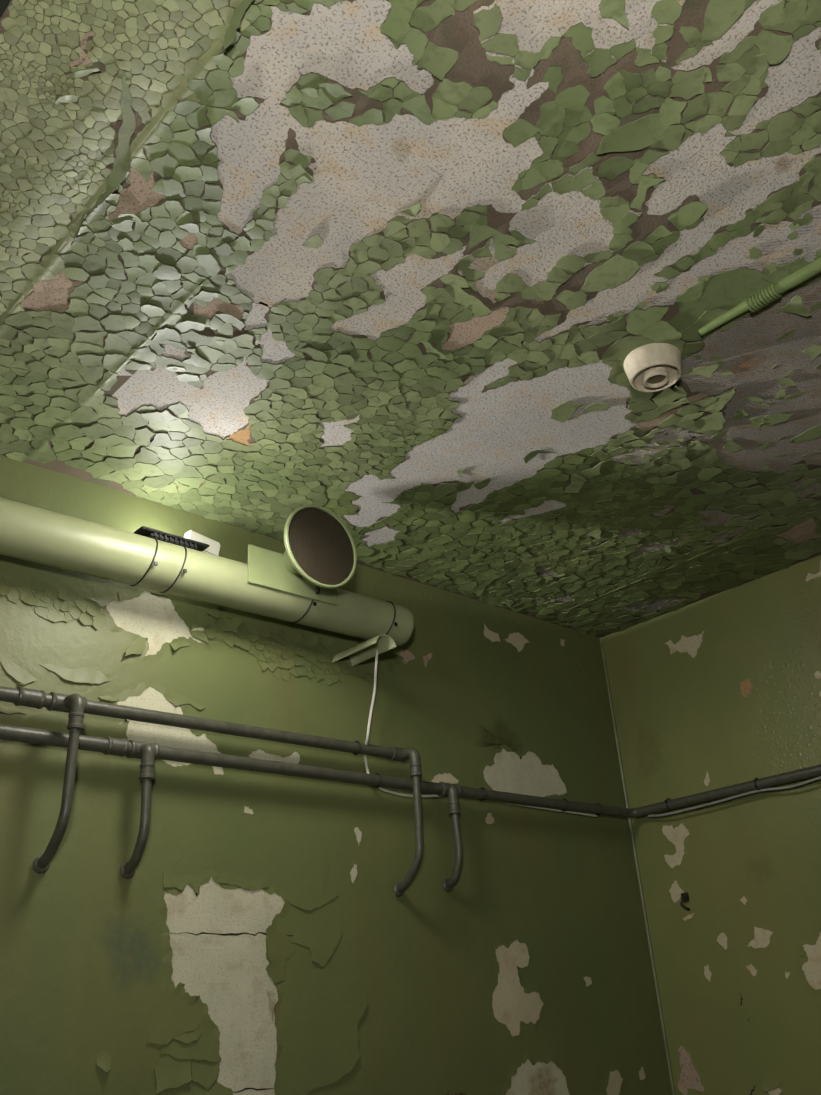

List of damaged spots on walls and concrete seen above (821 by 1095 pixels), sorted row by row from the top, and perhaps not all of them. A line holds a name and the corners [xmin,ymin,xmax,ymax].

peeling [59,22,106,79]
peeling [0,254,110,330]
peeling [73,0,821,556]
peeling [568,523,694,563]
peeling [88,587,213,661]
peeling [0,654,229,755]
peeling [154,759,230,783]
peeling [245,746,303,764]
peeling [478,743,571,807]
peeling [147,868,296,1095]
peeling [487,933,575,1095]
peeling [784,925,821,998]